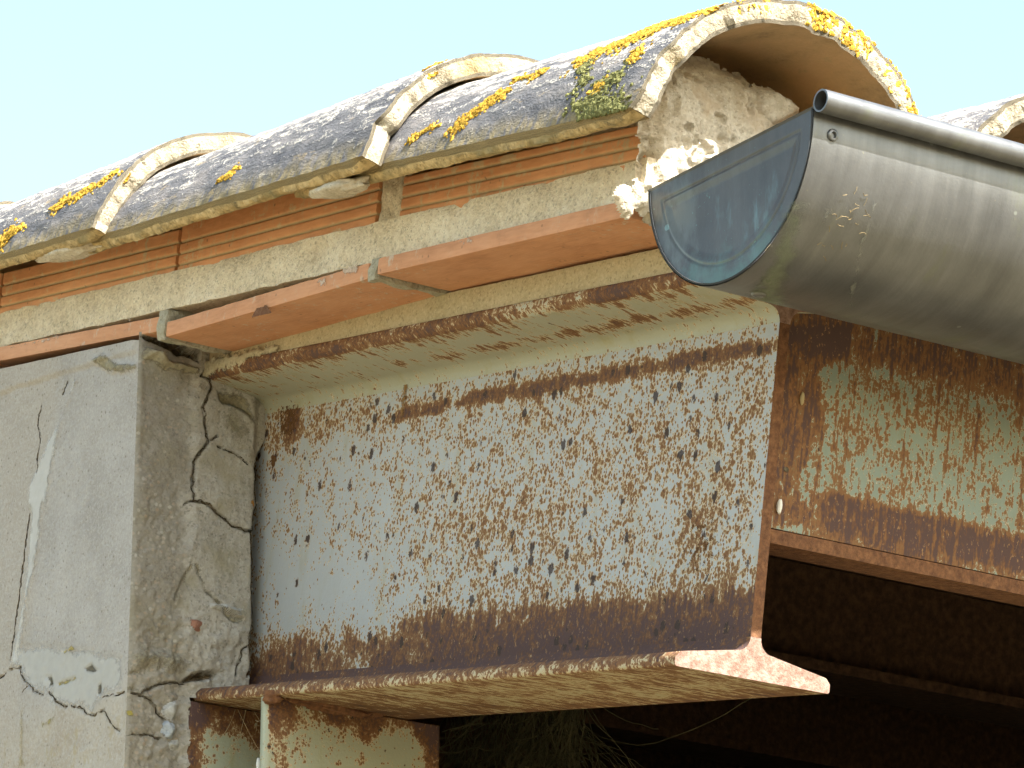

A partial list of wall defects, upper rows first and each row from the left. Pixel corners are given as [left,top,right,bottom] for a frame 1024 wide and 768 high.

crack [36,381,68,473]
corrosion [278,404,298,441]
crack [183,375,257,676]
corrosion [683,510,721,575]
crack [0,514,184,740]
peeling [17,646,182,712]